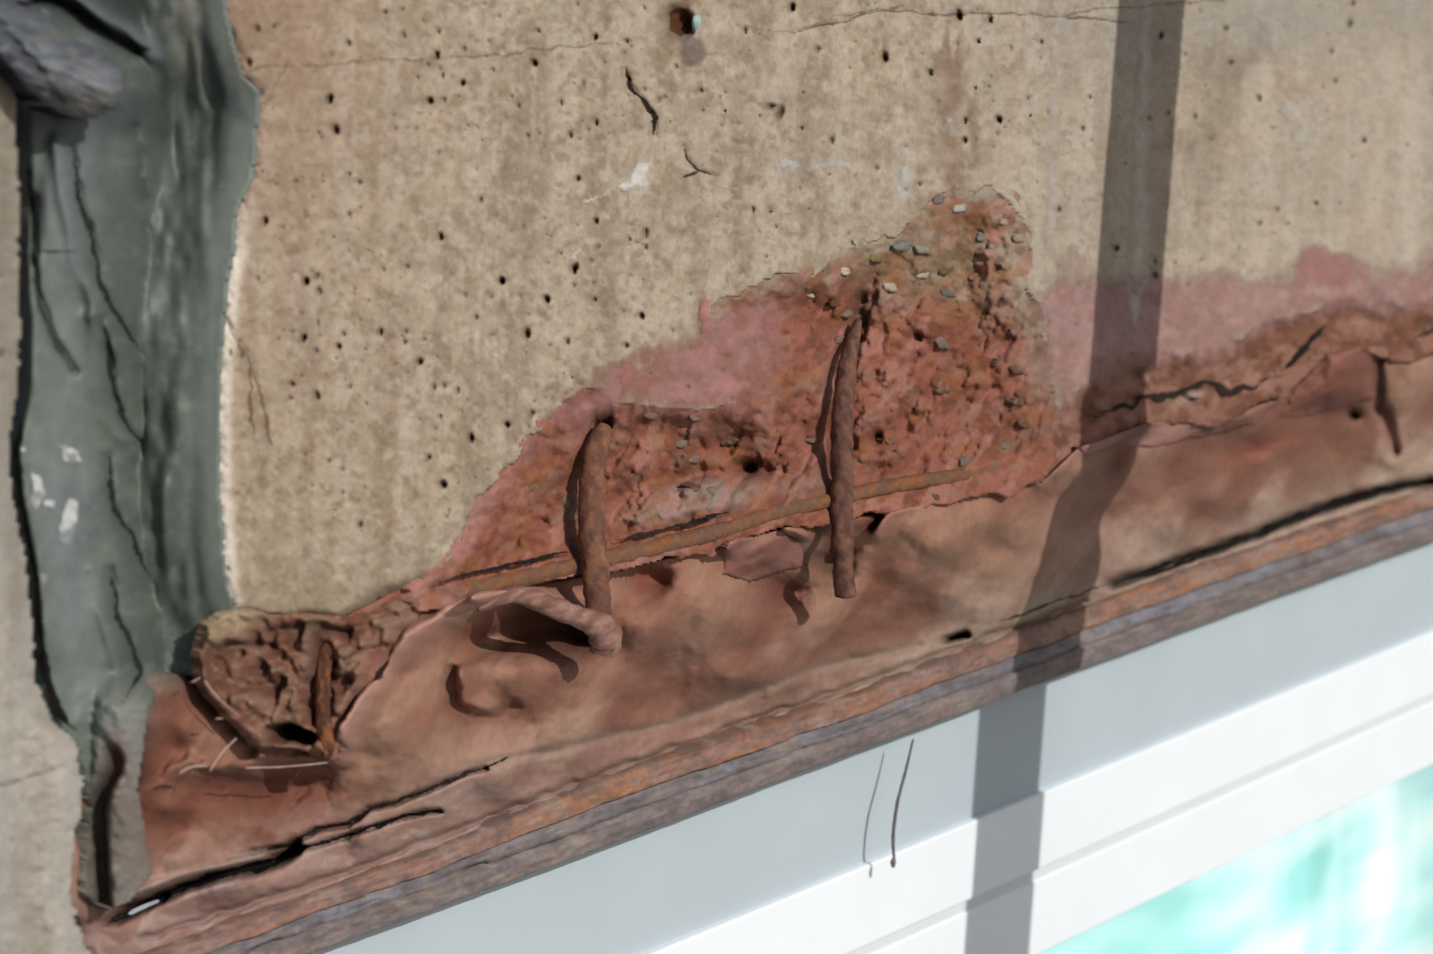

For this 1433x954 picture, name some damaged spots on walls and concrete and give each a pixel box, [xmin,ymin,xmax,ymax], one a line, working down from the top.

crack [626,69,715,177]
corrosion [561,299,782,419]
corrosion [1042,256,1433,405]
crack [438,551,572,583]
crack [617,512,729,541]
spalling [190,182,1433,763]
crack [1004,480,1428,620]
crack [373,659,389,681]
crack [948,632,970,640]
crack [108,757,509,923]